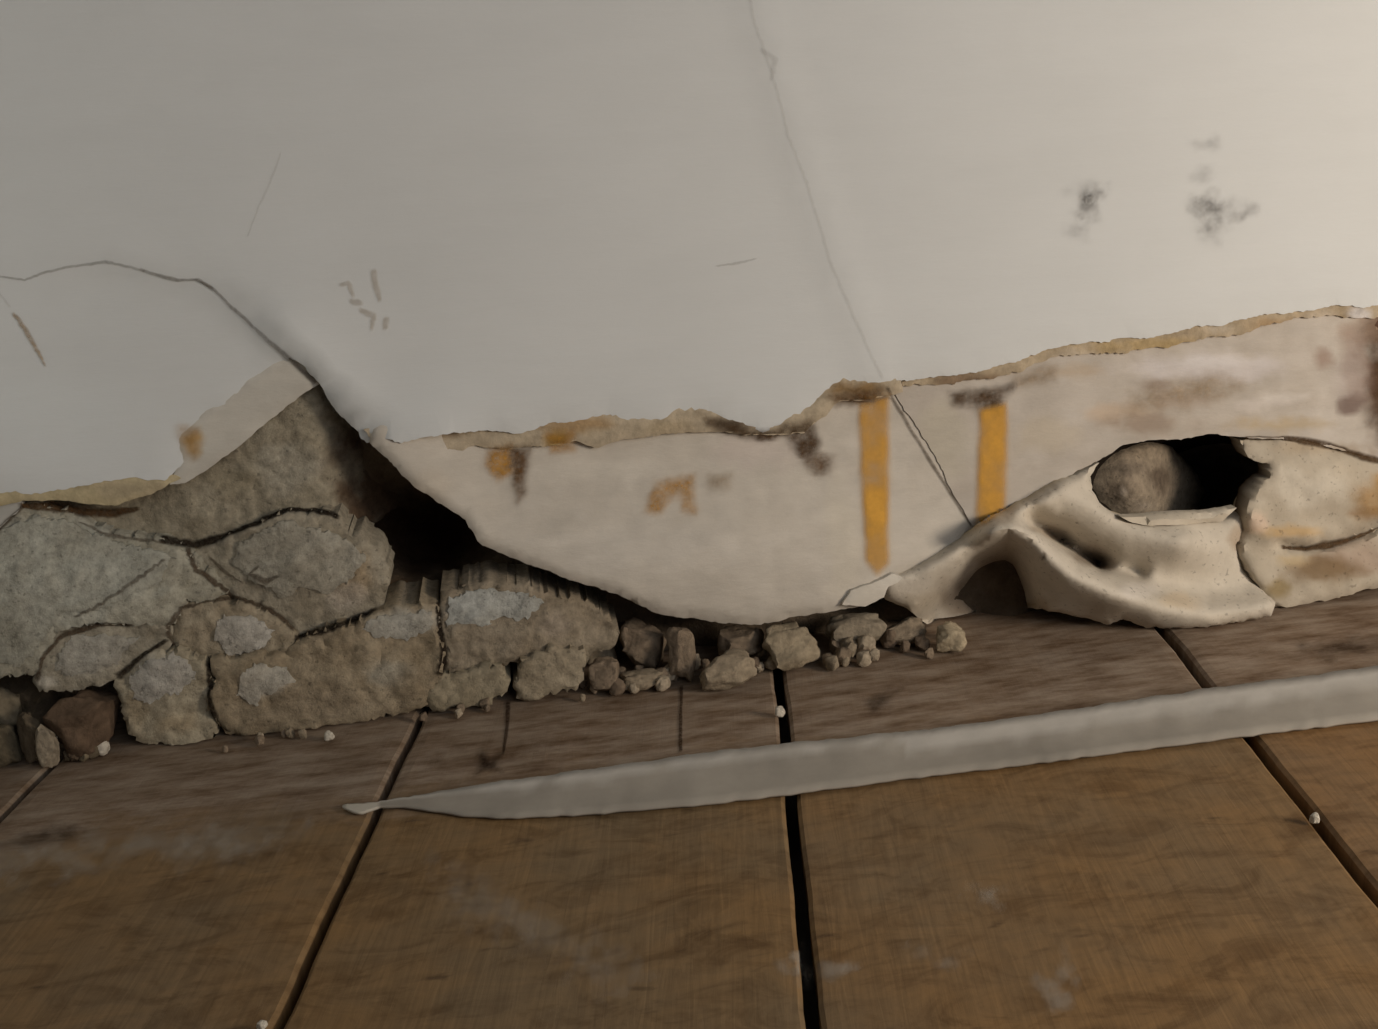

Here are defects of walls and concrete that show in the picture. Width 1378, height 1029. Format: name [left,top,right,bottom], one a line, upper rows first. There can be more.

crack [13,314,44,364]
crack [143,270,210,287]
flaking render [0,358,620,745]
corrosion [489,449,526,493]
peeling [442,305,1378,451]
crack [888,388,970,524]
corrosion [954,388,1009,408]
flaking render [1090,434,1378,608]